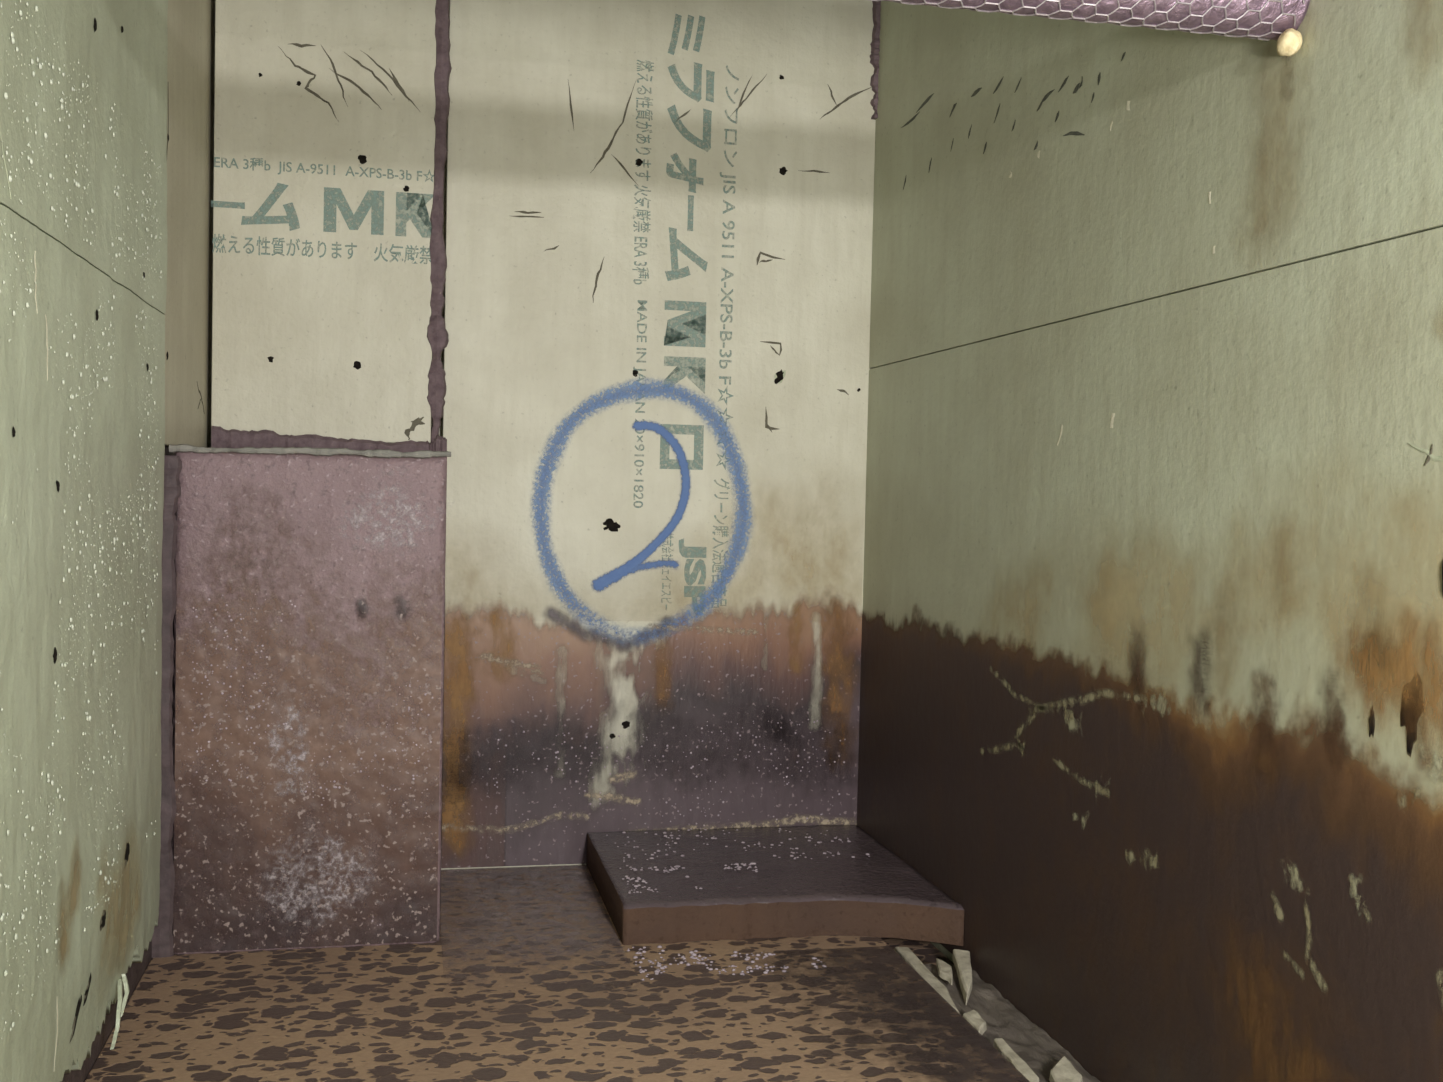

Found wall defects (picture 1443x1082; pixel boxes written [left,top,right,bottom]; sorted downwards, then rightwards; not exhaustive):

corrosion [1348,629,1443,764]
water stain [173,563,1443,1082]
spalling [70,974,92,1042]
peeling [110,973,129,1050]